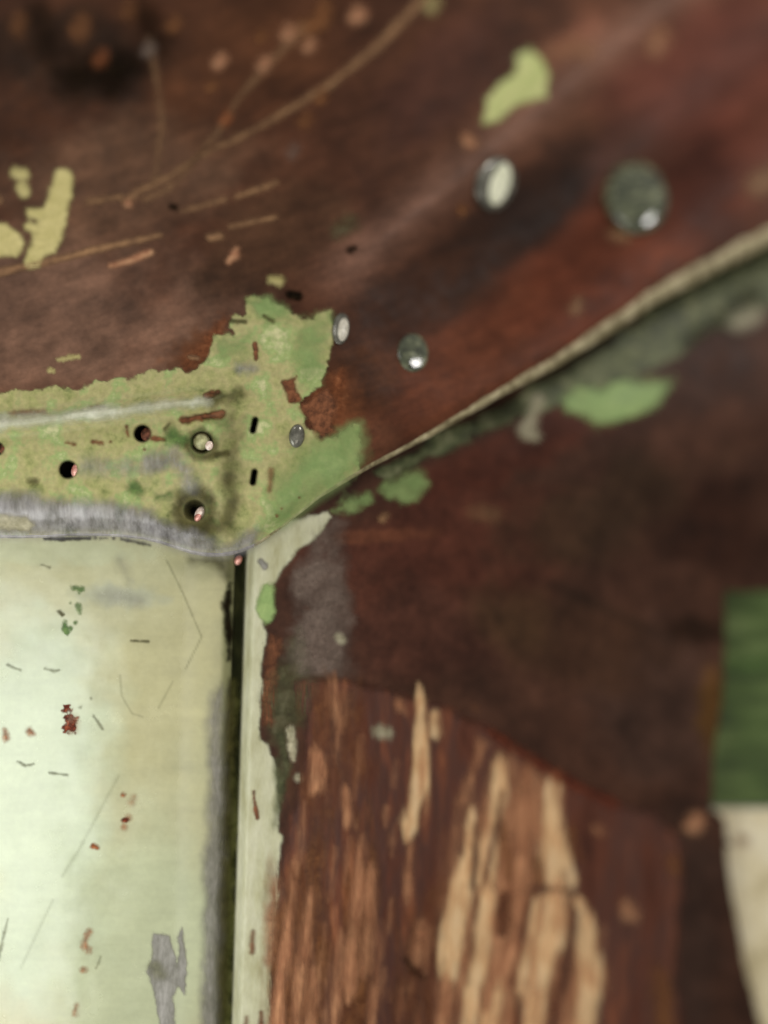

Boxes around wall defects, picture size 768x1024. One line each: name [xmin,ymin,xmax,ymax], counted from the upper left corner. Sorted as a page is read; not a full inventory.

peeling [0,168,73,269]
peeling [0,277,705,1024]
corrosion [61,705,78,733]